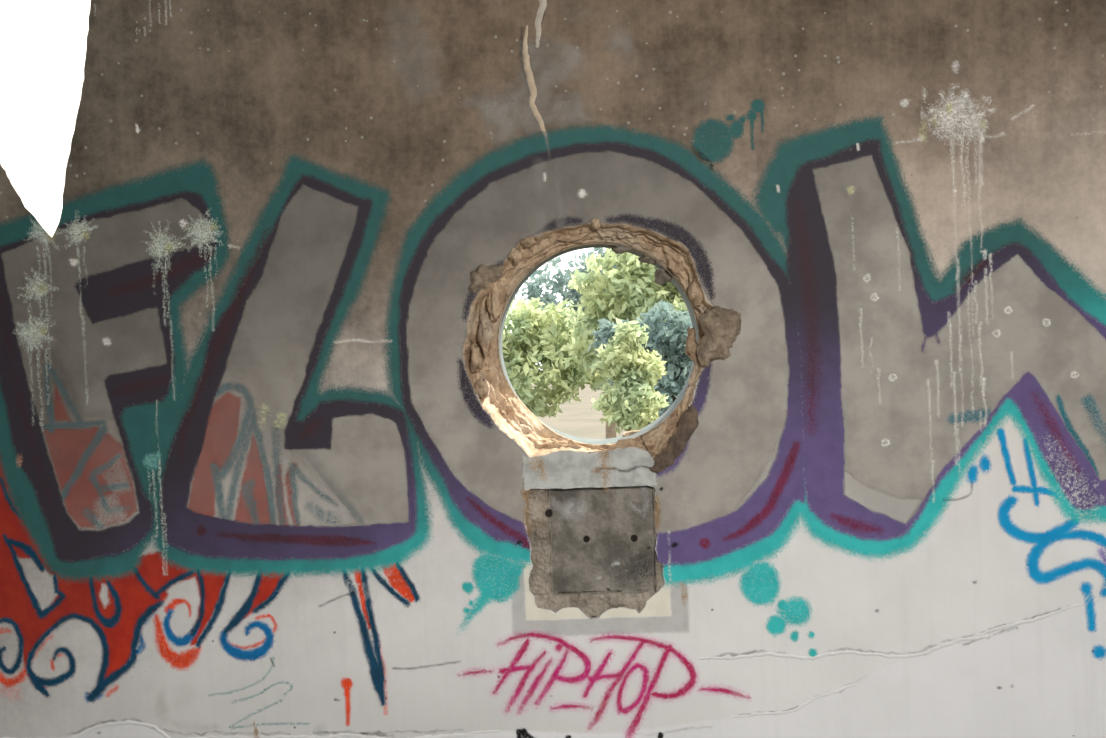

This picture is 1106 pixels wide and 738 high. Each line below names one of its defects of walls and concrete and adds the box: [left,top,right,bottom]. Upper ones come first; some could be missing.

crack [521,0,547,136]
spalling [463,218,742,619]